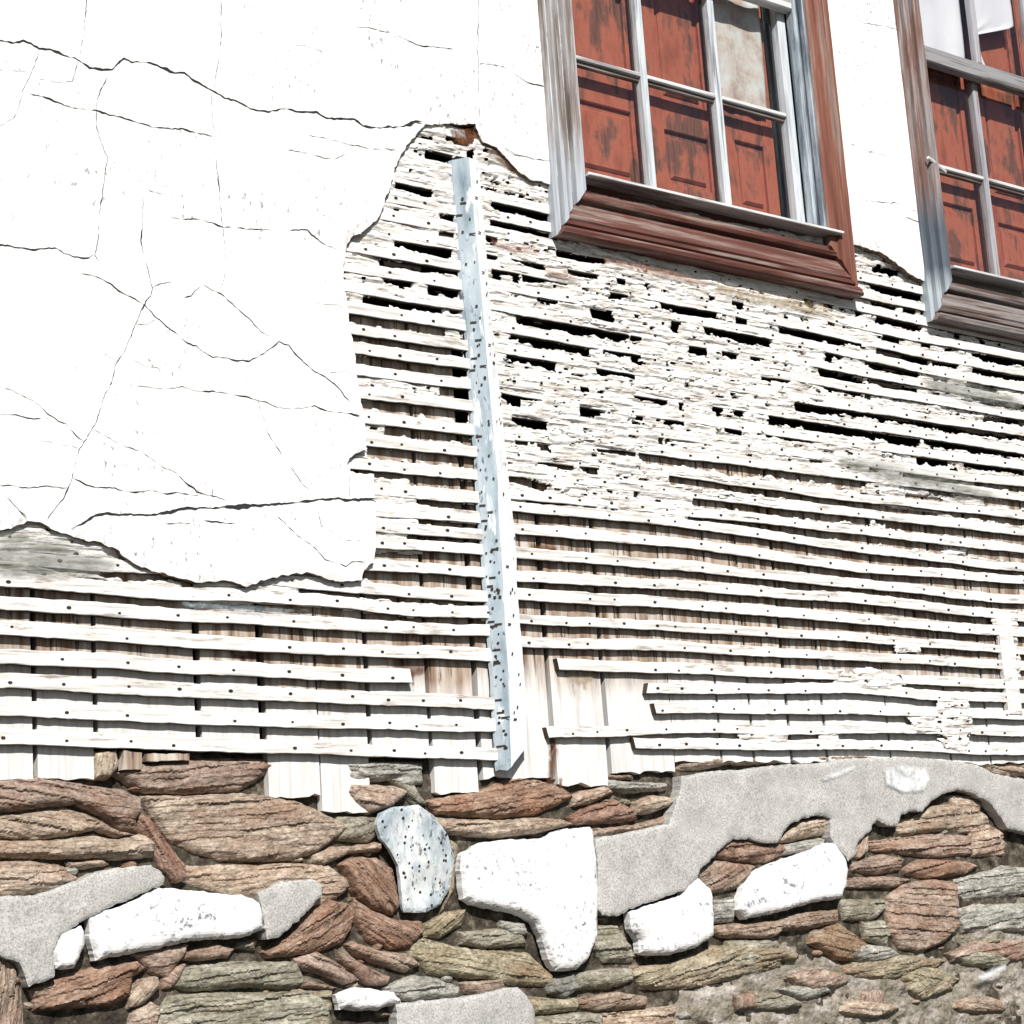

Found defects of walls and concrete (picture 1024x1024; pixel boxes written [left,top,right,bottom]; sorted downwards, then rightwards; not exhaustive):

crack [0,0,422,567]
spalling [343,125,1024,563]
spalling [0,522,314,605]
spalling [300,597,457,619]
spalling [833,667,906,690]
spalling [991,609,1021,679]